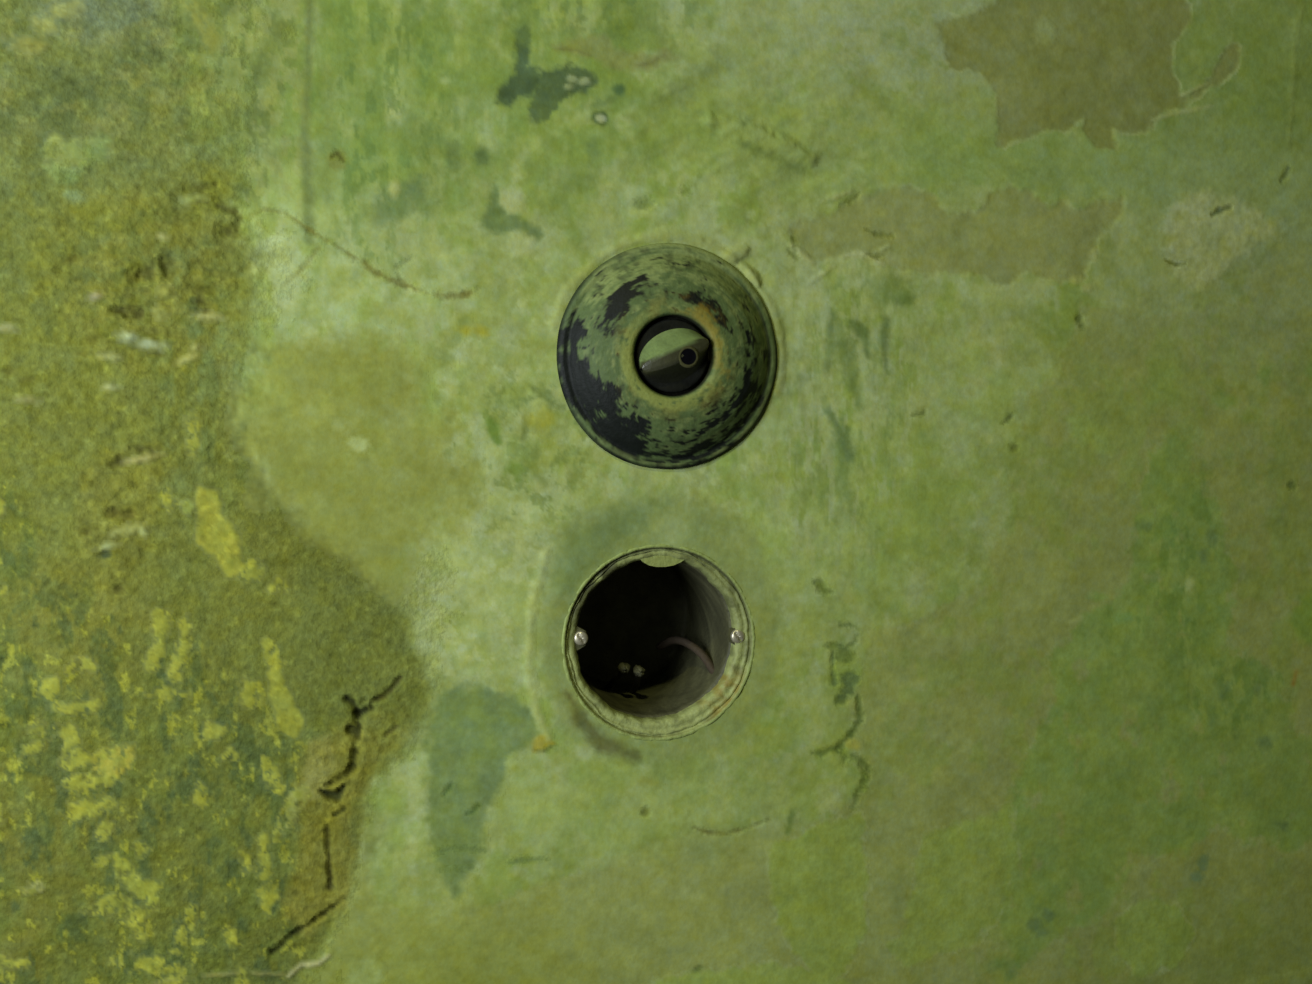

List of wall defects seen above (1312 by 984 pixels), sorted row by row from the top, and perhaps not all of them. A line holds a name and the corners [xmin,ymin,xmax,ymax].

damp [254,0,343,249]
peeling [932,0,1244,152]
crack [151,673,405,984]
crack [808,620,875,813]